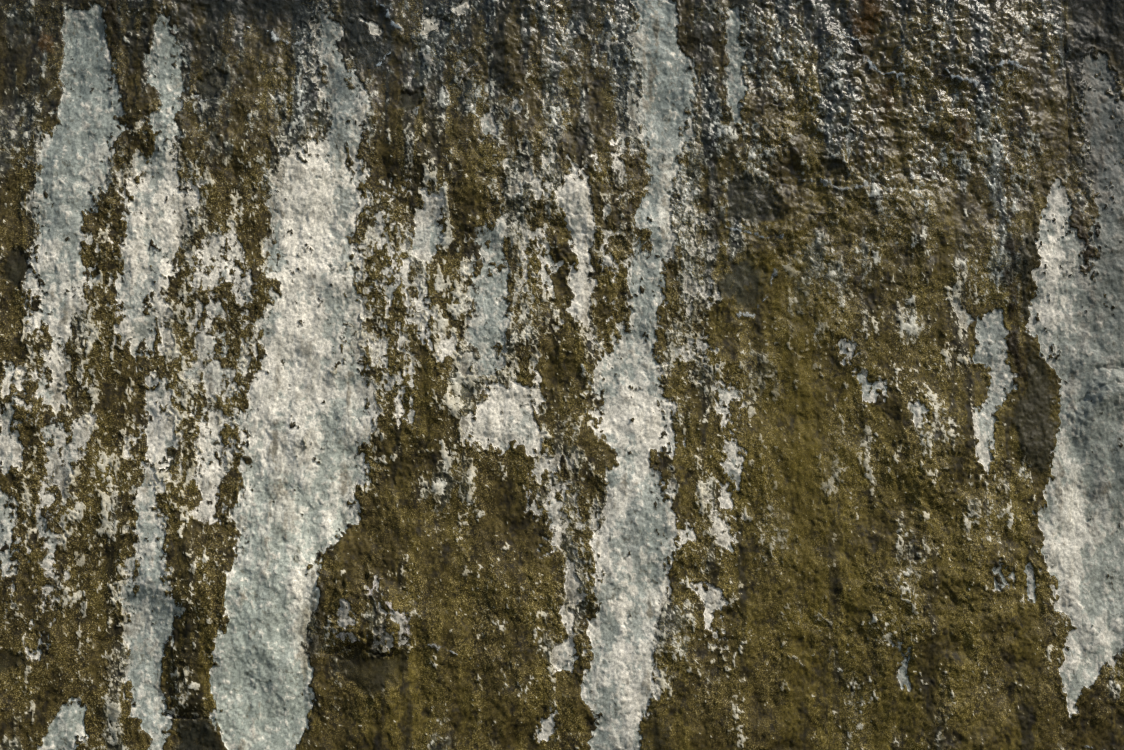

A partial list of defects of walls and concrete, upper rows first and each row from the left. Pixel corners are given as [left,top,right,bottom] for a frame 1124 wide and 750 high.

peeling [360,17,383,36]
peeling [452,0,470,21]
peeling [478,106,498,142]
peeling [176,221,256,525]
peeling [360,131,638,673]
peeling [672,336,747,552]
peeling [0,413,96,671]
peeling [992,559,1040,603]
spalling [330,575,411,694]
peeling [690,582,732,650]
peeling [38,697,89,750]
peeling [536,708,558,743]